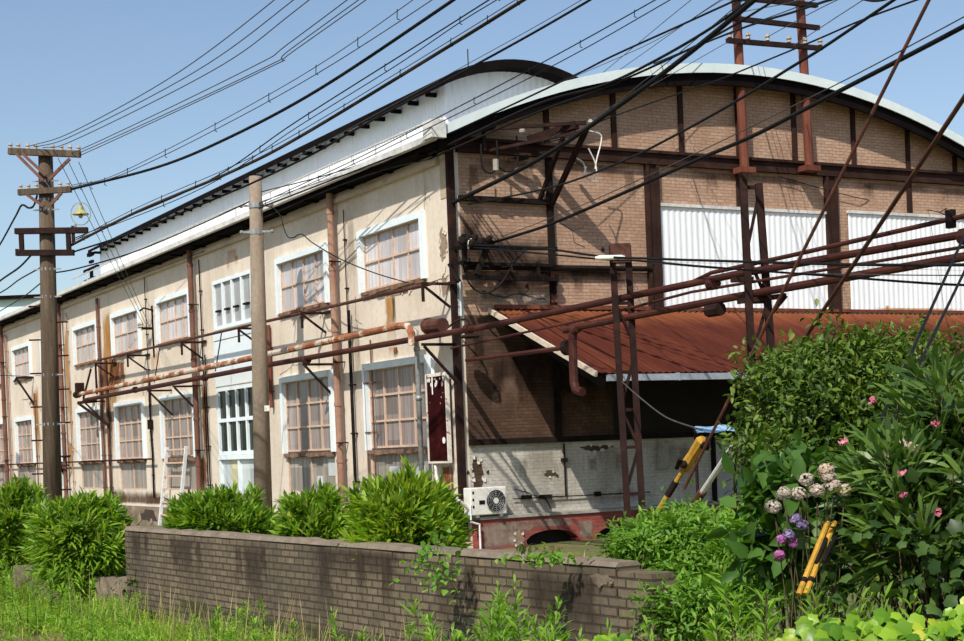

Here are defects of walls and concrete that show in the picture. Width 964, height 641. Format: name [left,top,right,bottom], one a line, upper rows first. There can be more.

water stain [464,221,480,238]
spalling [439,228,449,297]
rust [102,316,125,429]
water stain [560,363,571,390]
peeling [580,443,614,453]
peeling [470,455,489,488]
water stain [320,549,396,587]